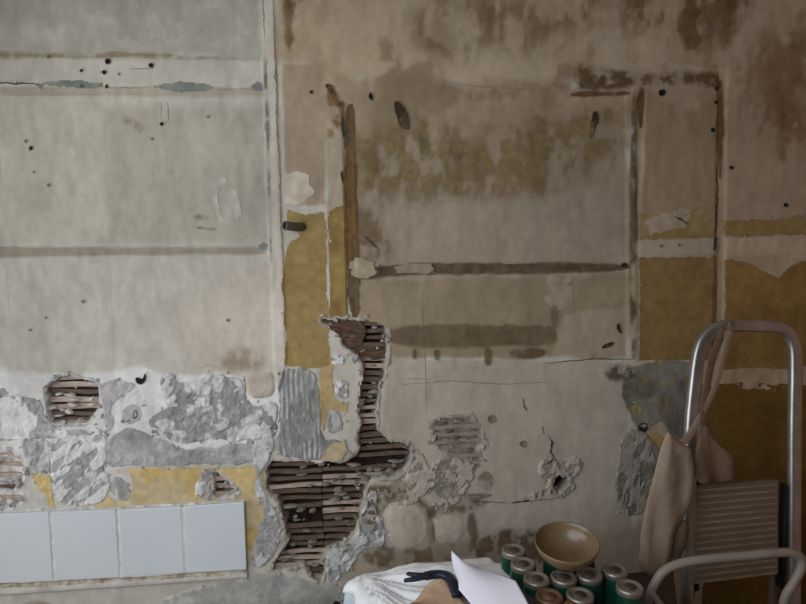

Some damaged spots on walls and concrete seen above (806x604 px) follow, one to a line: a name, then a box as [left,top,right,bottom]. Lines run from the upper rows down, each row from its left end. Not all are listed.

leakage [680,0,748,47]
leakage [356,117,608,198]
peeling [639,205,806,240]
flaking render [0,206,481,589]
peeling [615,256,806,516]
flaking render [521,456,586,503]
peeling [701,557,787,604]